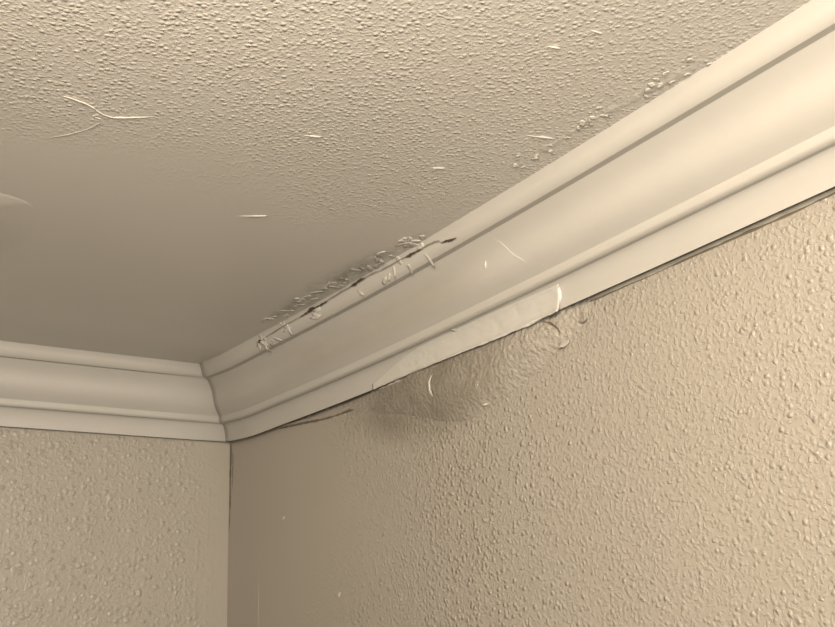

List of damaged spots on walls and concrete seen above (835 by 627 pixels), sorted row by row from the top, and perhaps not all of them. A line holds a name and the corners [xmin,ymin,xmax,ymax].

peeling [256,230,456,352]